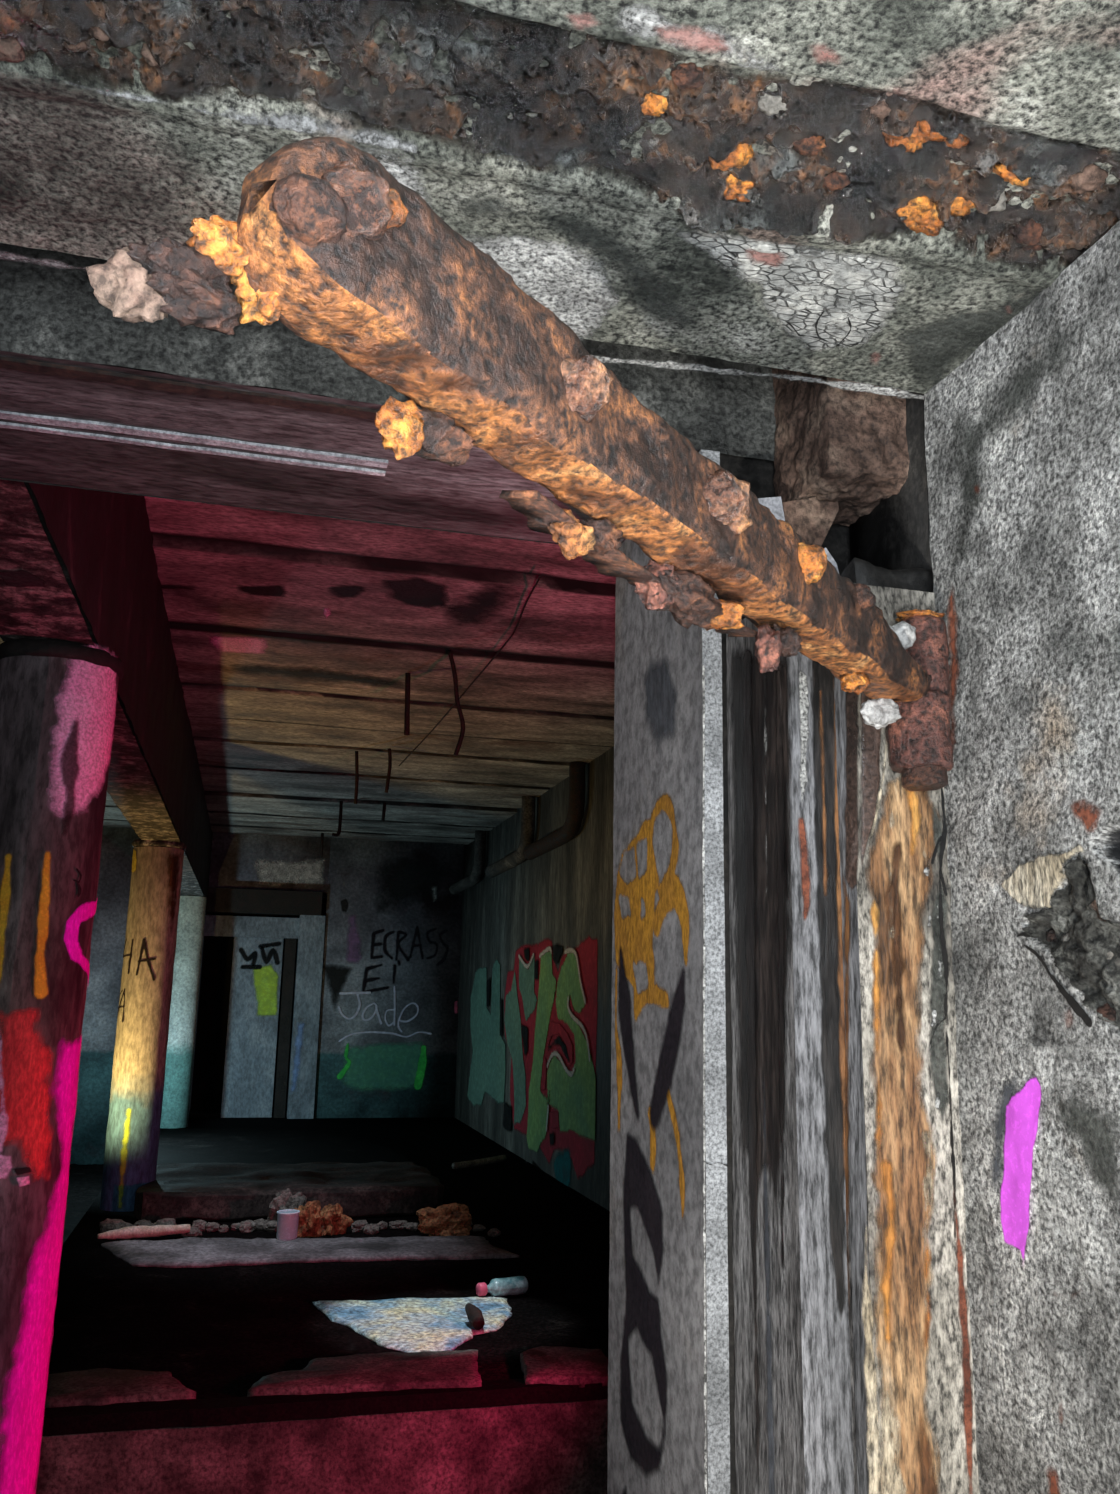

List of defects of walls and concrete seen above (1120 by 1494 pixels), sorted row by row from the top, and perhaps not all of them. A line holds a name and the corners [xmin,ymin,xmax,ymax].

corrosion [751,252,782,265]
crack [778,311,858,346]
corrosion [948,593,958,745]
spalling [1001,846,1120,1030]
spalling [1105,830,1120,871]
leakage [731,650,790,1494]
leakage [812,660,900,1494]
corrosion [868,780,937,1494]